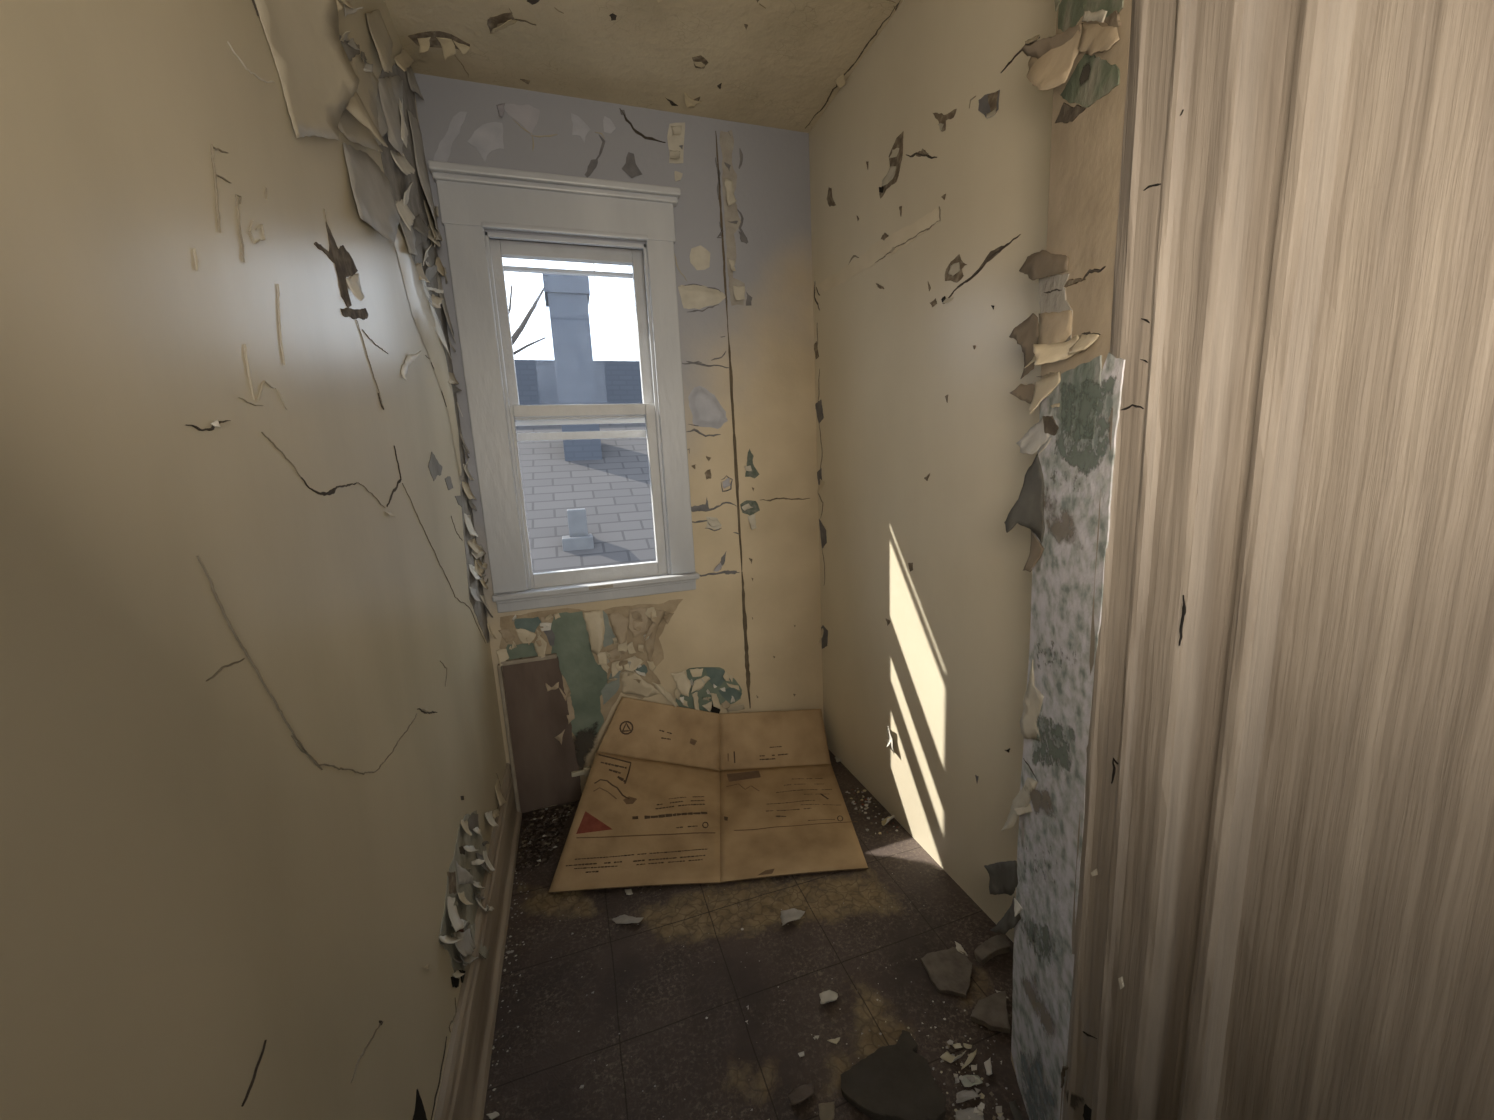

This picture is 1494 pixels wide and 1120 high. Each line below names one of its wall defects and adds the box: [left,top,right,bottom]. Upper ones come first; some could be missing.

crack [211,144,267,262]
crack [186,284,486,643]
peeling [254,0,760,745]
crack [527,0,564,14]
crack [686,131,809,708]
peeling [814,285,827,584]
peeling [879,132,903,198]
peeling [933,90,1000,132]
crack [930,234,1021,307]
peeling [1021,0,1124,123]
crack [196,556,447,775]
peeling [438,773,507,988]